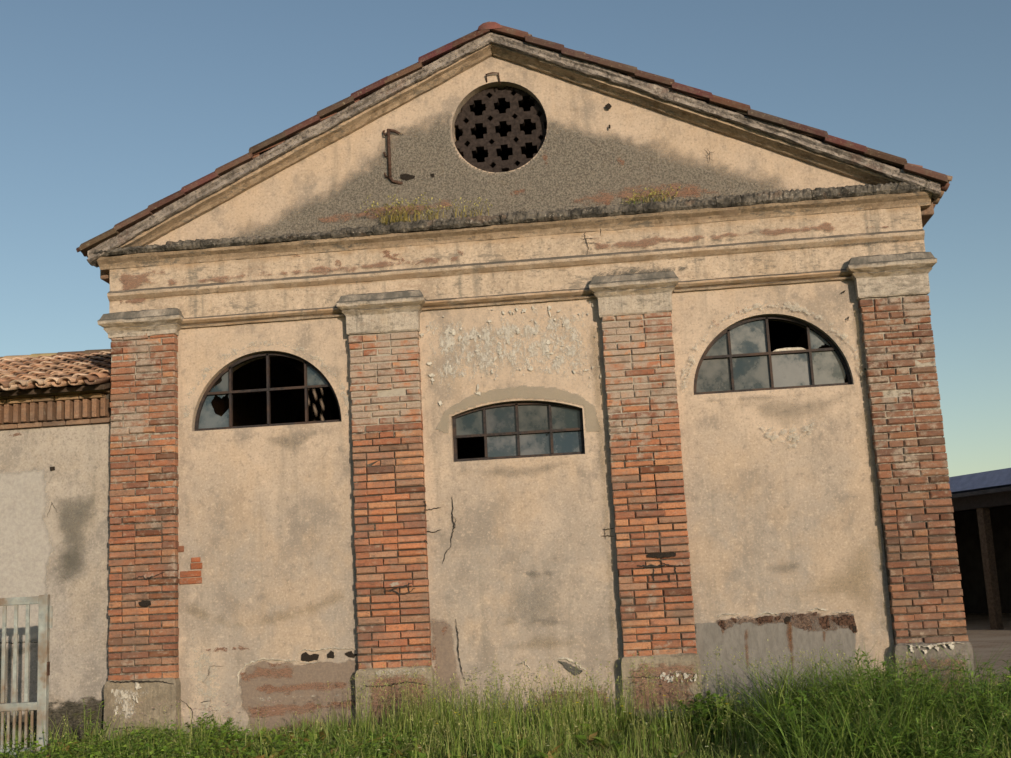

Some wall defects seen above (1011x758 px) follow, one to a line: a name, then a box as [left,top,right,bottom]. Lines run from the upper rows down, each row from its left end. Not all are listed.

spalling [715,608,857,633]